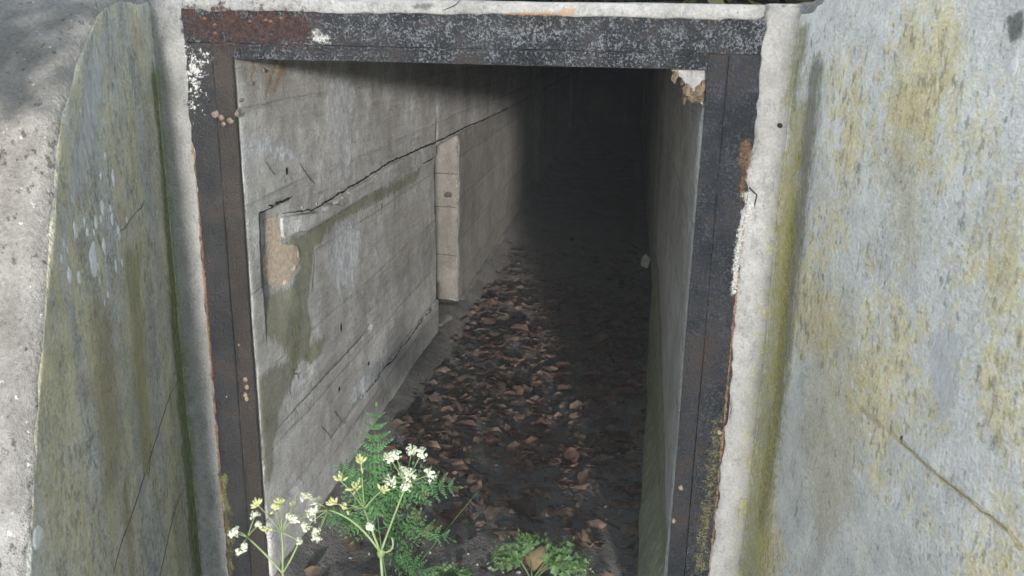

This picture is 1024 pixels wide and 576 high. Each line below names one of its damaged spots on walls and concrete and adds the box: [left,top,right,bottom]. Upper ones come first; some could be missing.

corrosion [180,0,322,101]
spalling [670,69,707,107]
spalling [262,214,300,289]
crack [259,108,508,288]
peeling [730,192,755,296]
corrosion [738,139,753,252]
corrosion [709,268,741,573]
crack [862,408,1022,550]